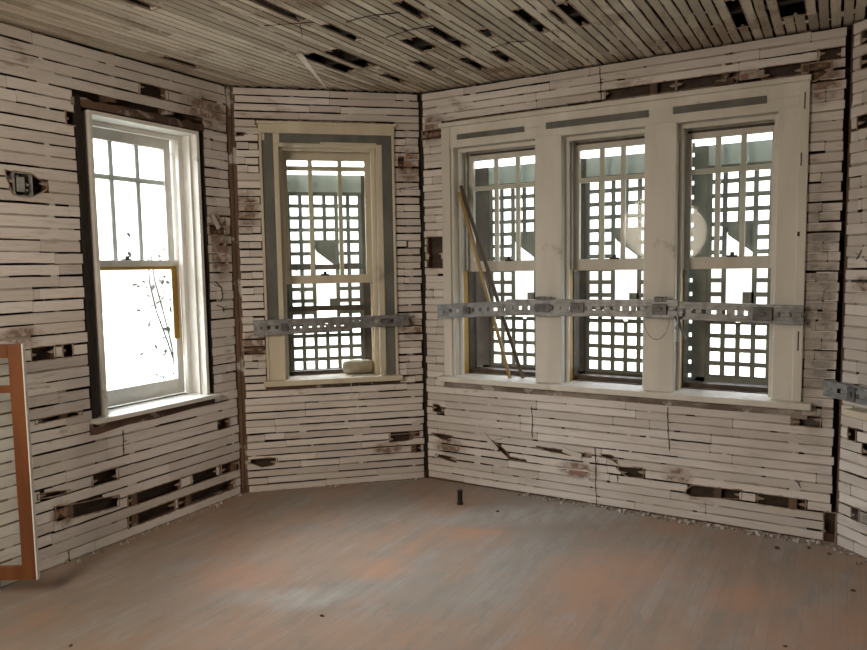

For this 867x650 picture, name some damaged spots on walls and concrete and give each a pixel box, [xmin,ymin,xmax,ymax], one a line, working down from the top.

spalling [248,0,409,83]
spalling [398,22,490,71]
spalling [34,454,279,530]
spalling [386,430,463,463]
spalling [491,442,646,478]
crack [591,447,599,503]
spalling [683,483,808,511]
spalling [847,426,867,457]
spalling [821,507,837,544]